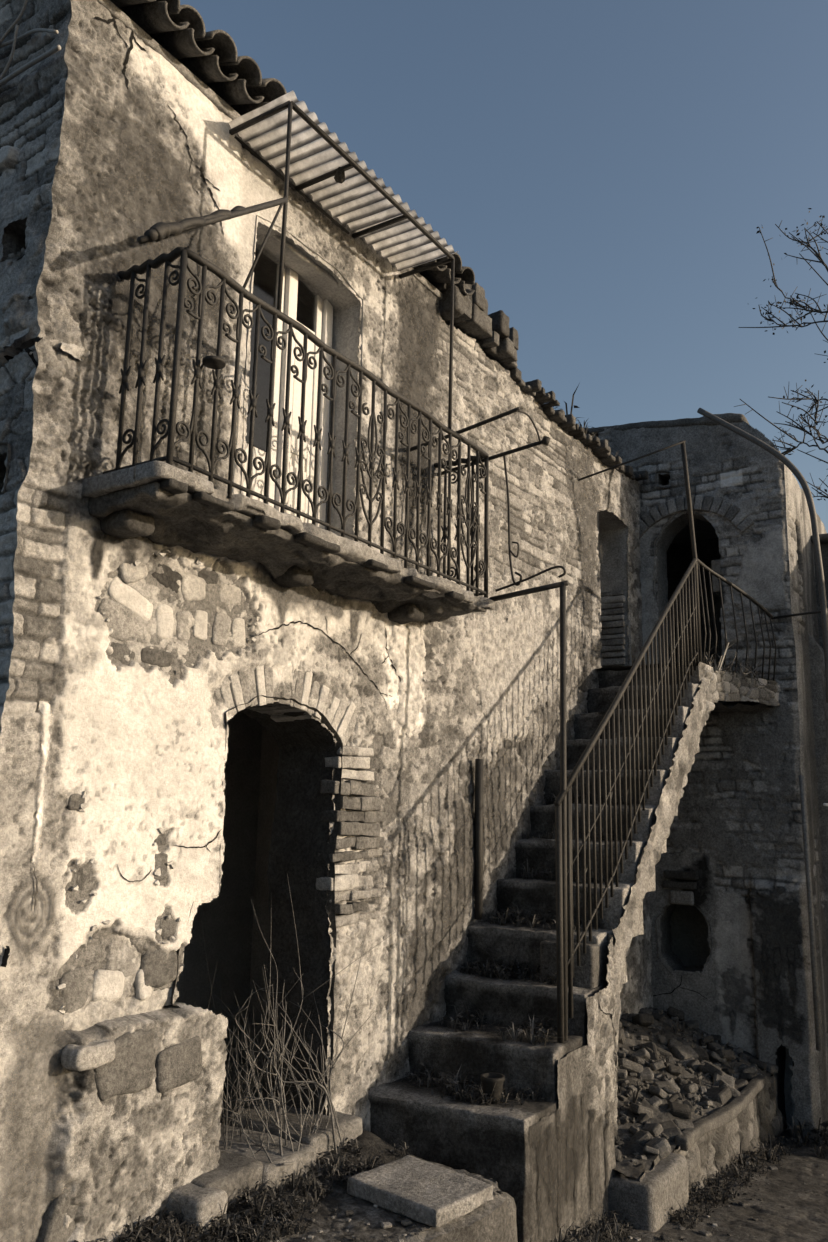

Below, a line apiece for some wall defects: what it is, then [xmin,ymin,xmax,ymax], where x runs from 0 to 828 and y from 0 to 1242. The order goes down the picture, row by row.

crack [94,17,146,89]
flaking render [96,550,260,674]
crack [247,616,401,709]
flaking render [72,858,98,903]
flaking render [57,913,202,1101]
water stain [717,886,809,1047]